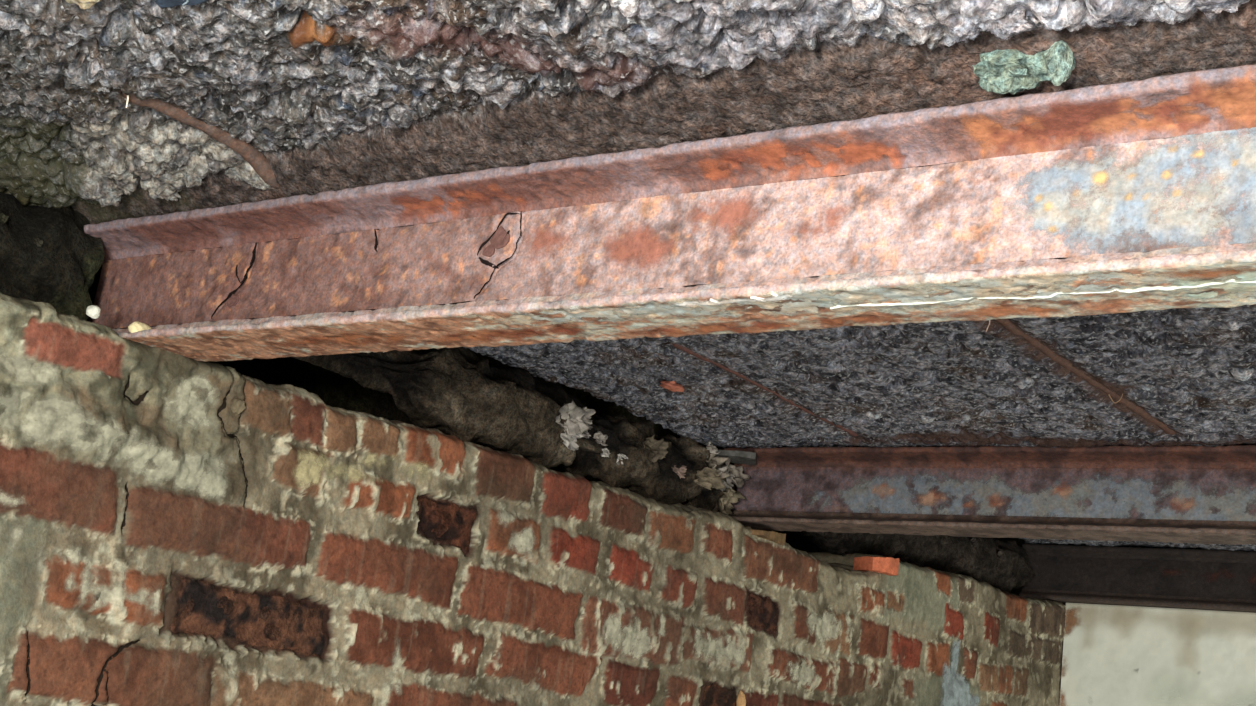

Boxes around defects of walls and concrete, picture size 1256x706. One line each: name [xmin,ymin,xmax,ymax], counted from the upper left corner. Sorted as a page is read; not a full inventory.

corrosion [965,77,1256,154]
corrosion [701,142,905,181]
corrosion [393,186,524,218]
crack [474,212,522,299]
corrosion [1175,270,1240,279]
corrosion [439,326,584,342]
corrosion [631,317,891,335]
crack [123,375,149,406]
corrosion [849,306,1256,448]
crack [217,365,248,504]
crack [23,633,31,701]
crack [91,640,140,706]